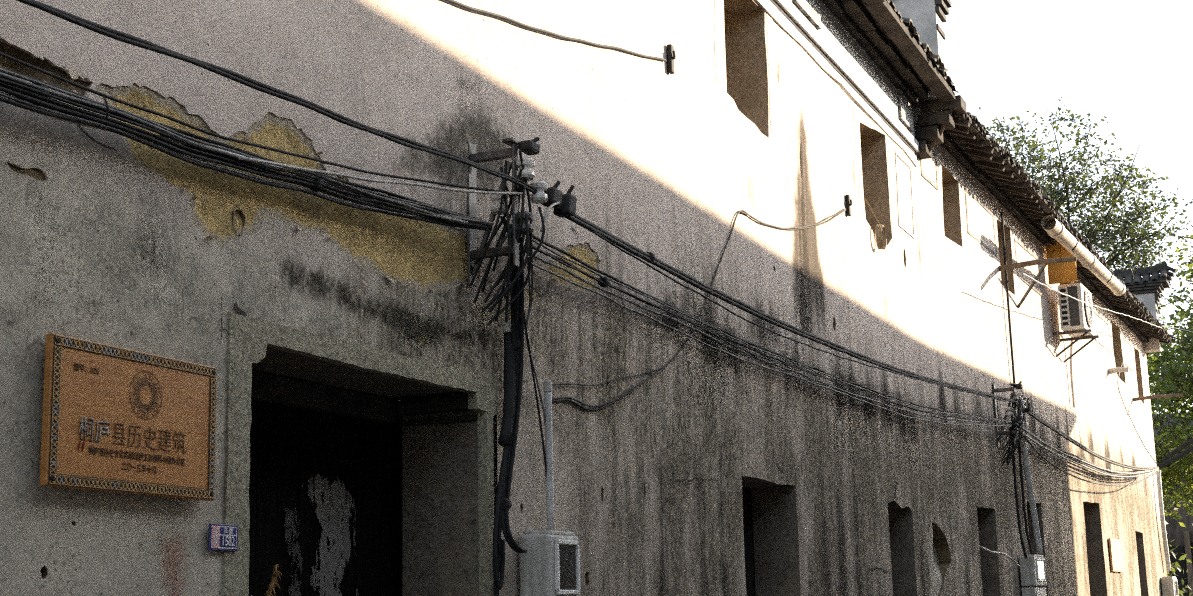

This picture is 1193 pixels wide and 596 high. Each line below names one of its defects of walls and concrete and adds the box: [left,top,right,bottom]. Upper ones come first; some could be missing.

flaking render [0,36,484,293]
flaking render [526,242,603,310]
damp [793,119,826,333]
damp [663,288,740,377]
damp [823,490,862,596]